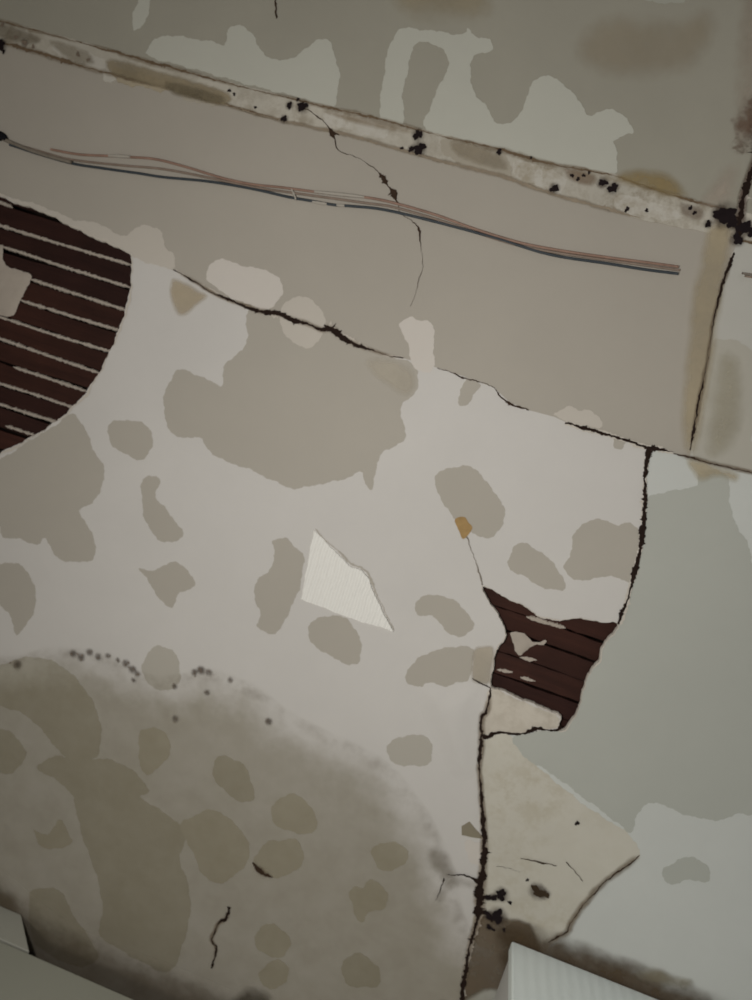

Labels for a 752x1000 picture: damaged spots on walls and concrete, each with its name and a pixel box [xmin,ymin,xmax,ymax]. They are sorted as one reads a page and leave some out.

crack [305,109,423,306]
spalling [0,193,133,563]
crack [173,269,403,359]
crack [437,368,529,411]
crack [565,152,752,625]
water stain [473,647,493,683]
peeling [472,338,752,943]
crack [211,906,231,969]
crack [437,678,640,1000]